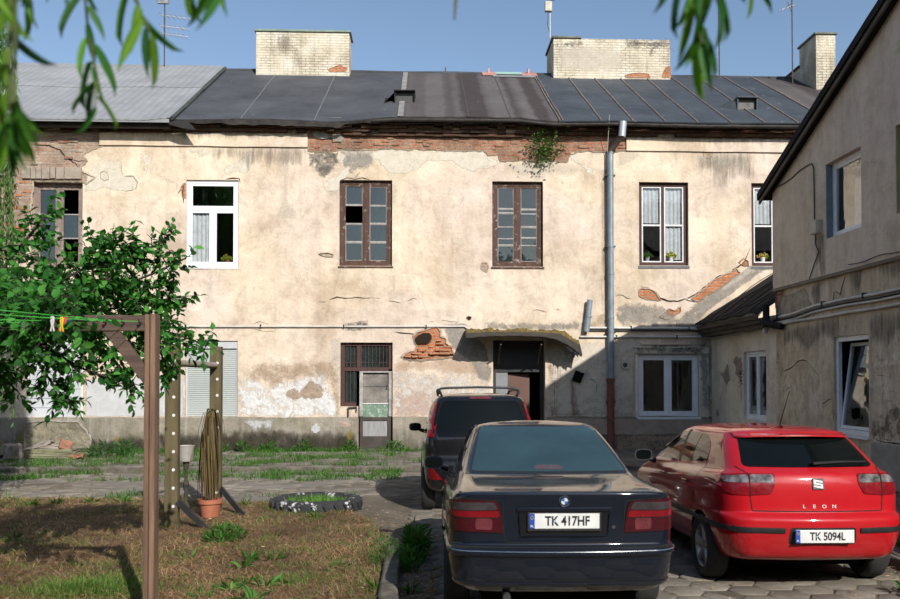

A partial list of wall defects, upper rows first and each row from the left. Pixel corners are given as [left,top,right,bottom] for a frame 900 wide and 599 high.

crack [33,144,84,166]
flaking render [306,130,632,191]
flaking render [0,130,137,261]
crack [319,294,418,303]
flaking render [638,287,681,320]
flaking render [691,258,752,303]
crack [396,319,459,335]
peeling [238,340,350,427]